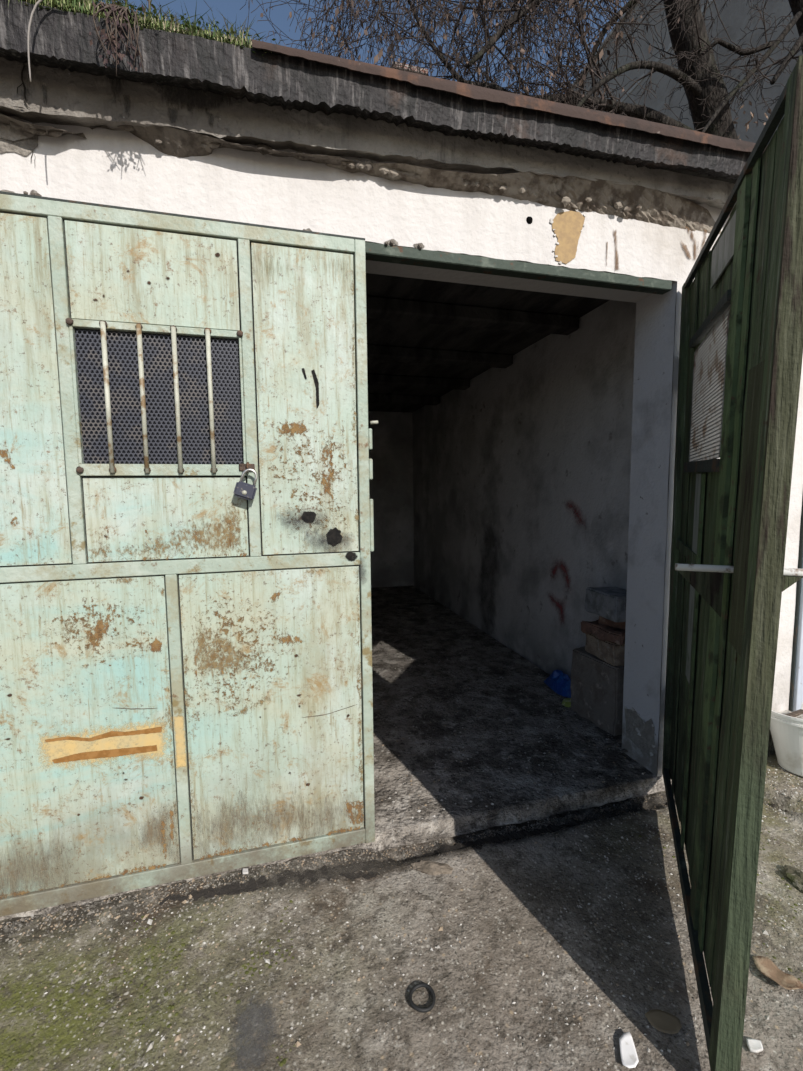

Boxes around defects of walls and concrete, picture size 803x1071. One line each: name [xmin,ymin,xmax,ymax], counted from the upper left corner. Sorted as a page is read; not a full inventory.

spalling [0,114,721,264]
rust [93,503,247,562]
rust [264,412,359,533]
rust [41,592,302,768]
rust [191,718,364,860]
peeling [624,706,656,757]
rust [0,805,178,899]